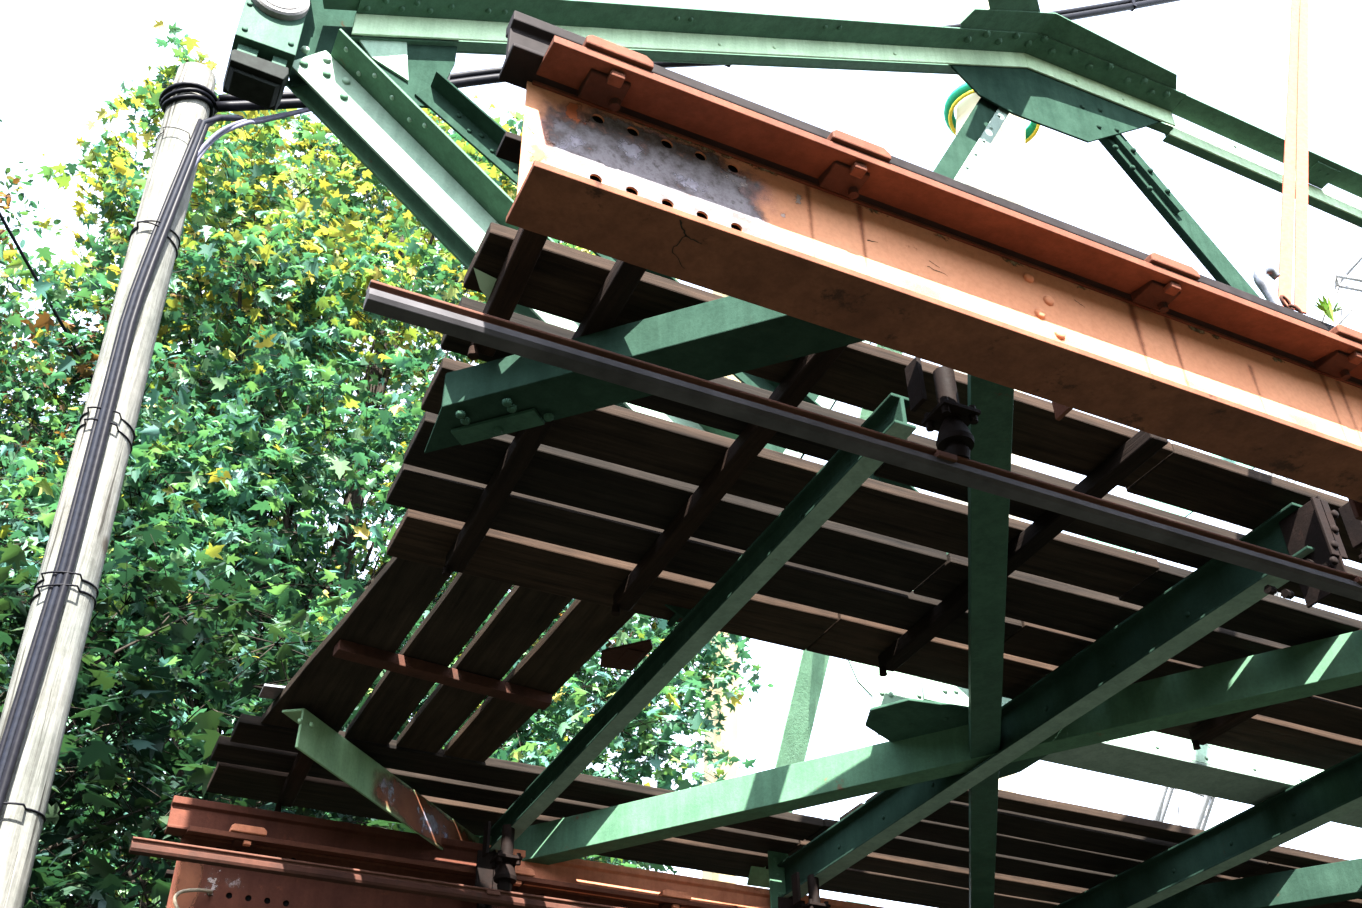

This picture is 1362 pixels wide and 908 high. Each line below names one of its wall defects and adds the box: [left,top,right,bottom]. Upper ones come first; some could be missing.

peeling [527,102,775,239]